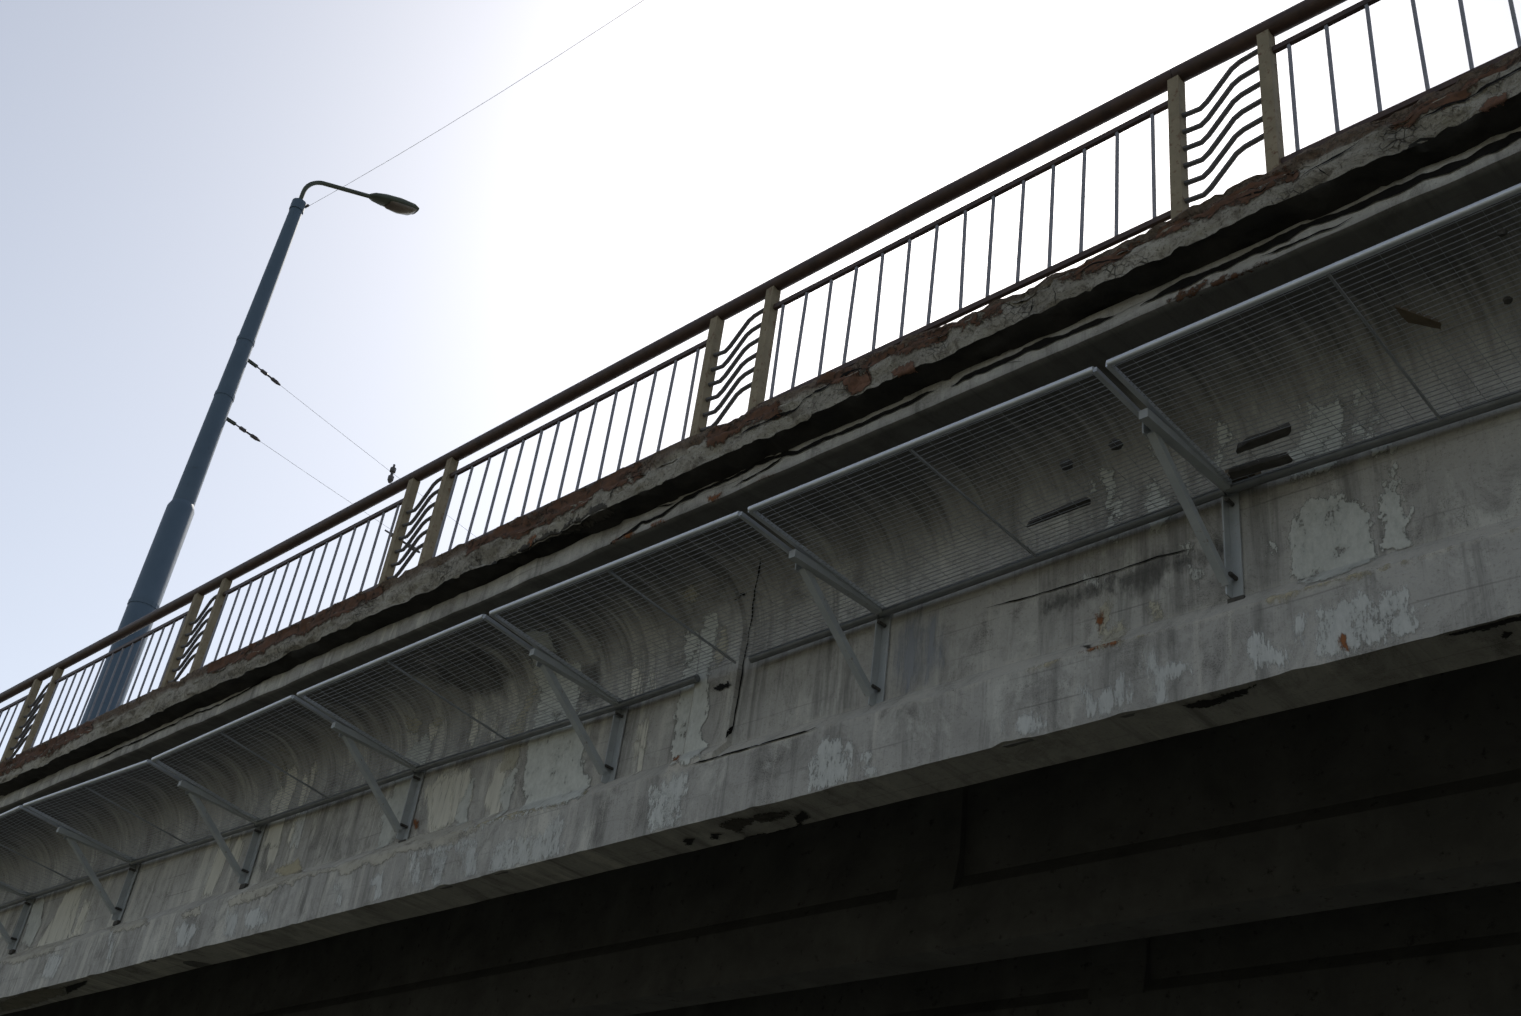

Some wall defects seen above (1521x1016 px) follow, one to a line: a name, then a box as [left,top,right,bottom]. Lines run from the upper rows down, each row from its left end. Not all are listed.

spalling [499,501,614,560]
peeling [1088,468,1125,544]
peeling [1144,445,1171,533]
peeling [1265,383,1414,585]